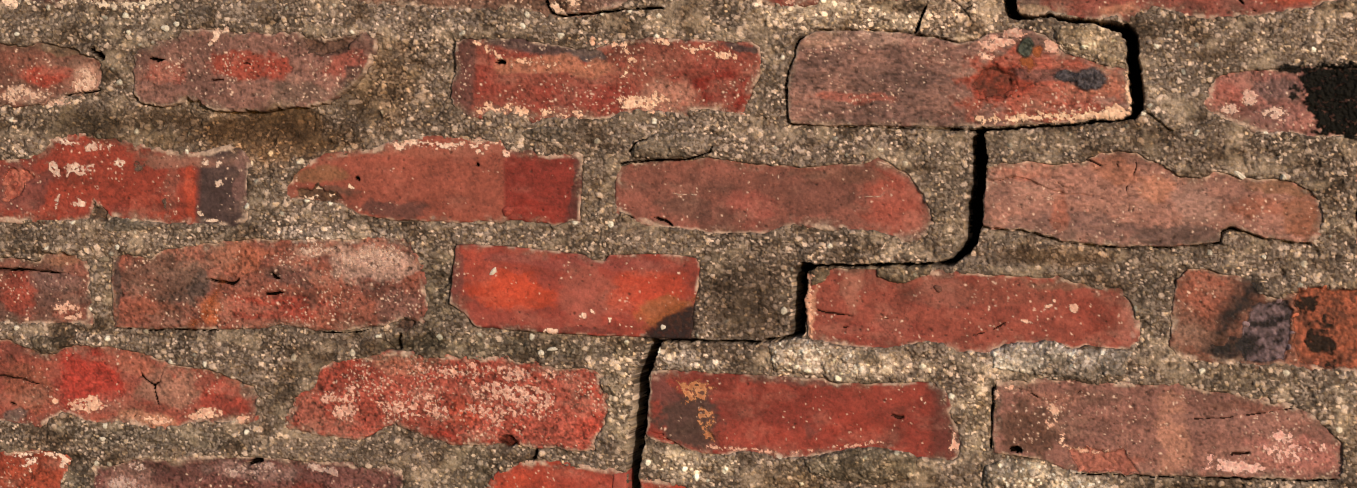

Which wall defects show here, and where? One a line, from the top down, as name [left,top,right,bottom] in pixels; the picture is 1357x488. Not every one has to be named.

crack [914,0,972,40]
crack [1006,0,1170,131]
crack [621,139,713,164]
crack [771,127,1064,339]
crack [637,339,666,488]
crack [990,387,1080,447]